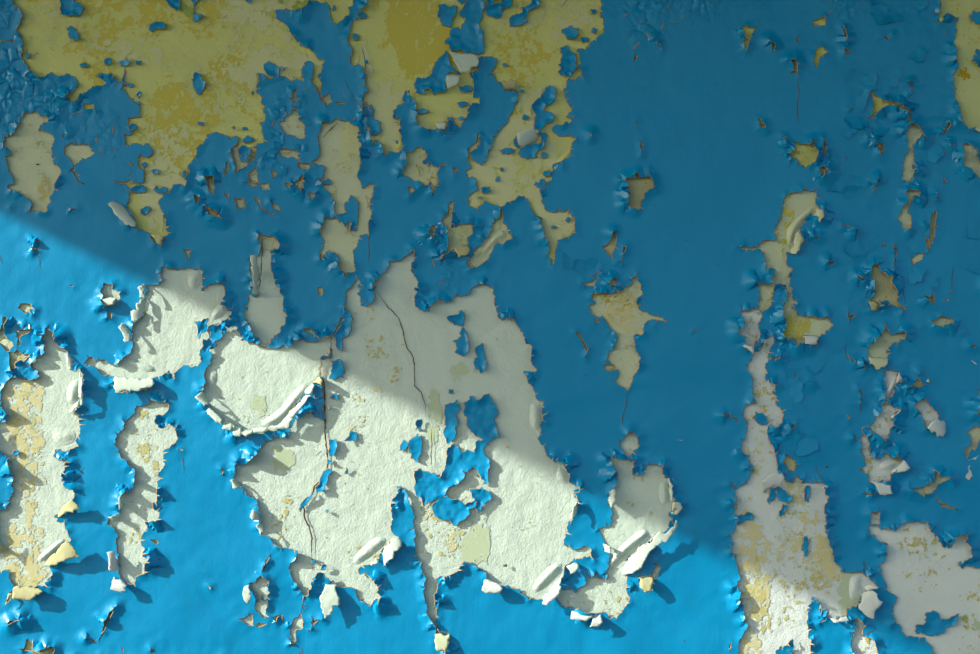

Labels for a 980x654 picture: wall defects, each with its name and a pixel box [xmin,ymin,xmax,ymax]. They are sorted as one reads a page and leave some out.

peeling [742,25,758,52]
peeling [782,135,831,176]
peeling [812,16,826,27]
peeling [814,46,828,68]
peeling [861,90,945,265]
peeling [934,0,980,181]
peeling [0,0,683,654]
peeling [722,189,980,654]